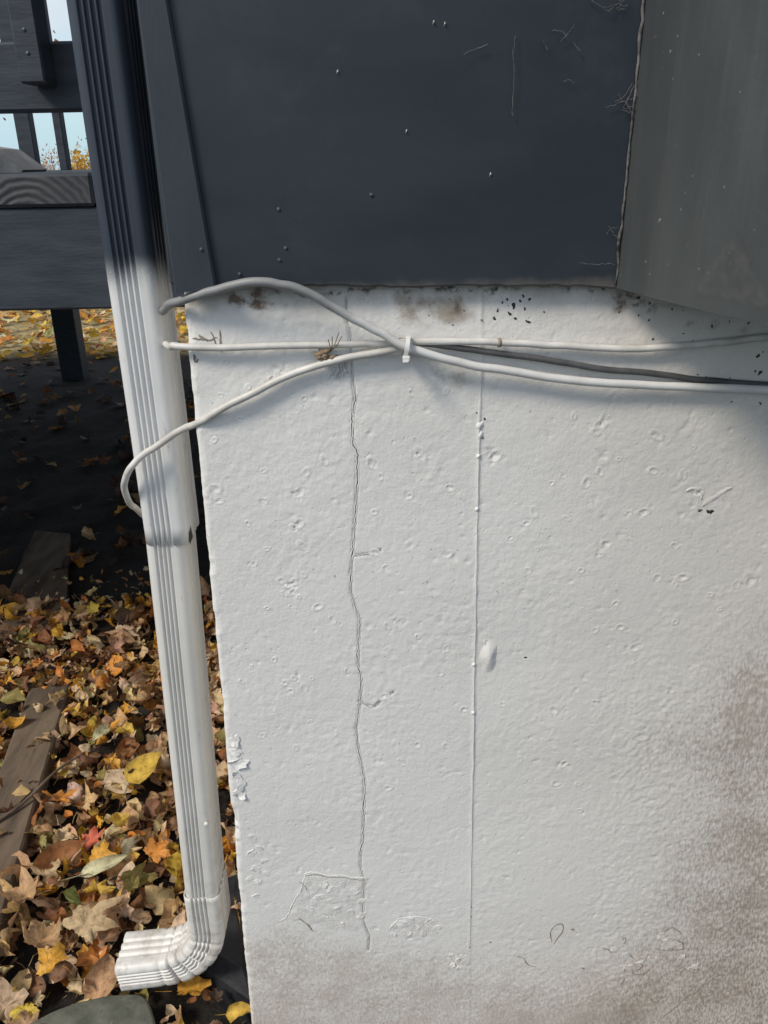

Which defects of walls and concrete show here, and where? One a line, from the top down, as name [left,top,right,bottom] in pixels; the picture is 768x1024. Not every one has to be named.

leakage [480,288,531,323]
crack [345,301,393,948]
spalling [228,734,249,800]